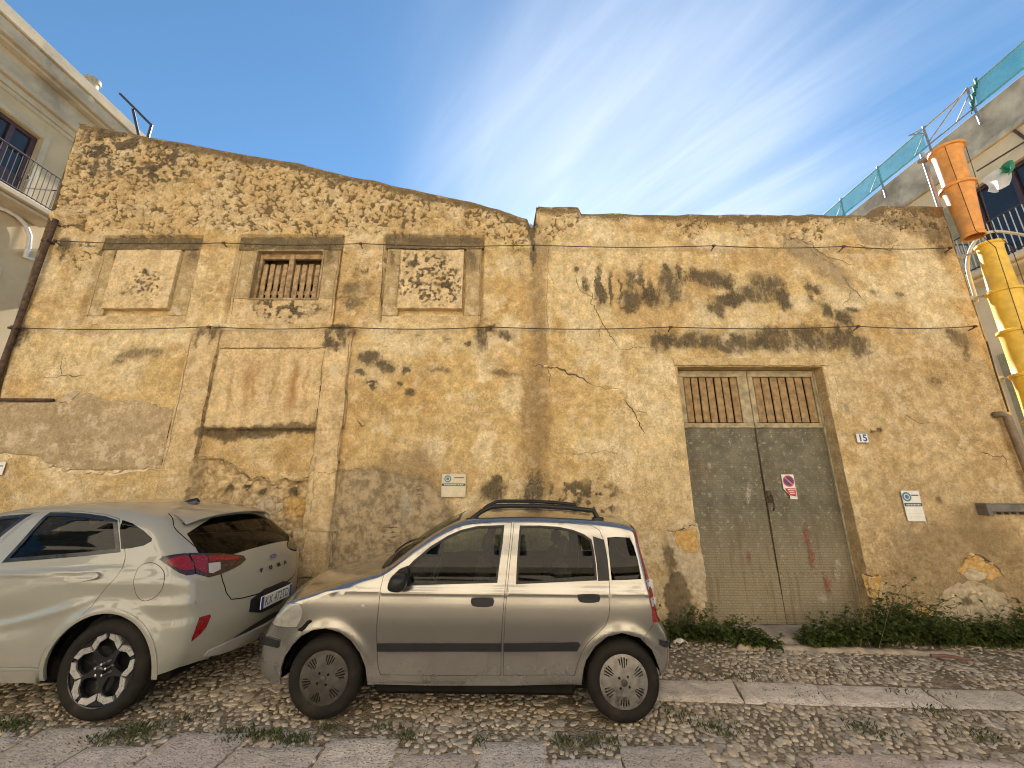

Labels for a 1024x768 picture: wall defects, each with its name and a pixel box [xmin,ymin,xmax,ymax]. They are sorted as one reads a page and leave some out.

water stain [322,330,346,351]
crack [534,236,647,432]
water stain [594,266,655,314]
water stain [776,289,791,309]
spalling [182,456,316,568]
spalling [667,523,708,602]
spalling [862,573,882,598]
spalling [915,552,1012,625]